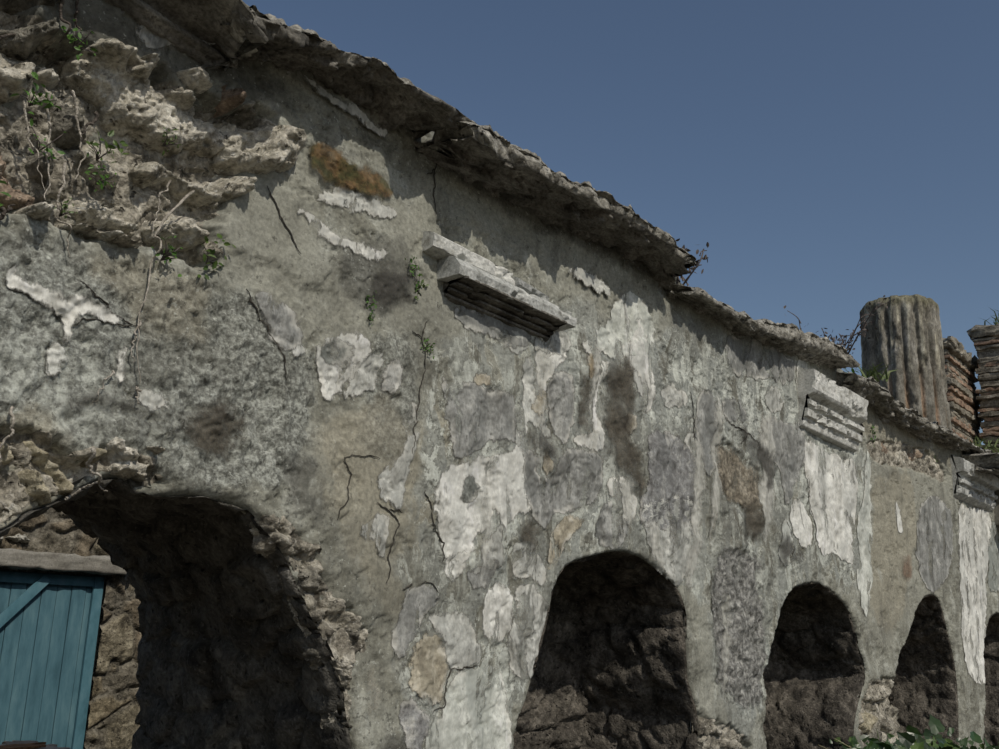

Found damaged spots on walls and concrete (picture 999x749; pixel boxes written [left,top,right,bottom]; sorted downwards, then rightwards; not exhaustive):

spalling [0,0,307,270]
crack [267,186,301,254]
flaking render [6,265,121,376]
crack [246,289,287,380]
crack [337,454,380,520]
flaking render [391,267,767,749]
leakage [579,351,646,524]
leakage [650,522,665,572]
leakage [686,398,724,582]
leakage [743,415,776,539]
flaking render [724,334,944,617]
flaking render [915,495,999,684]